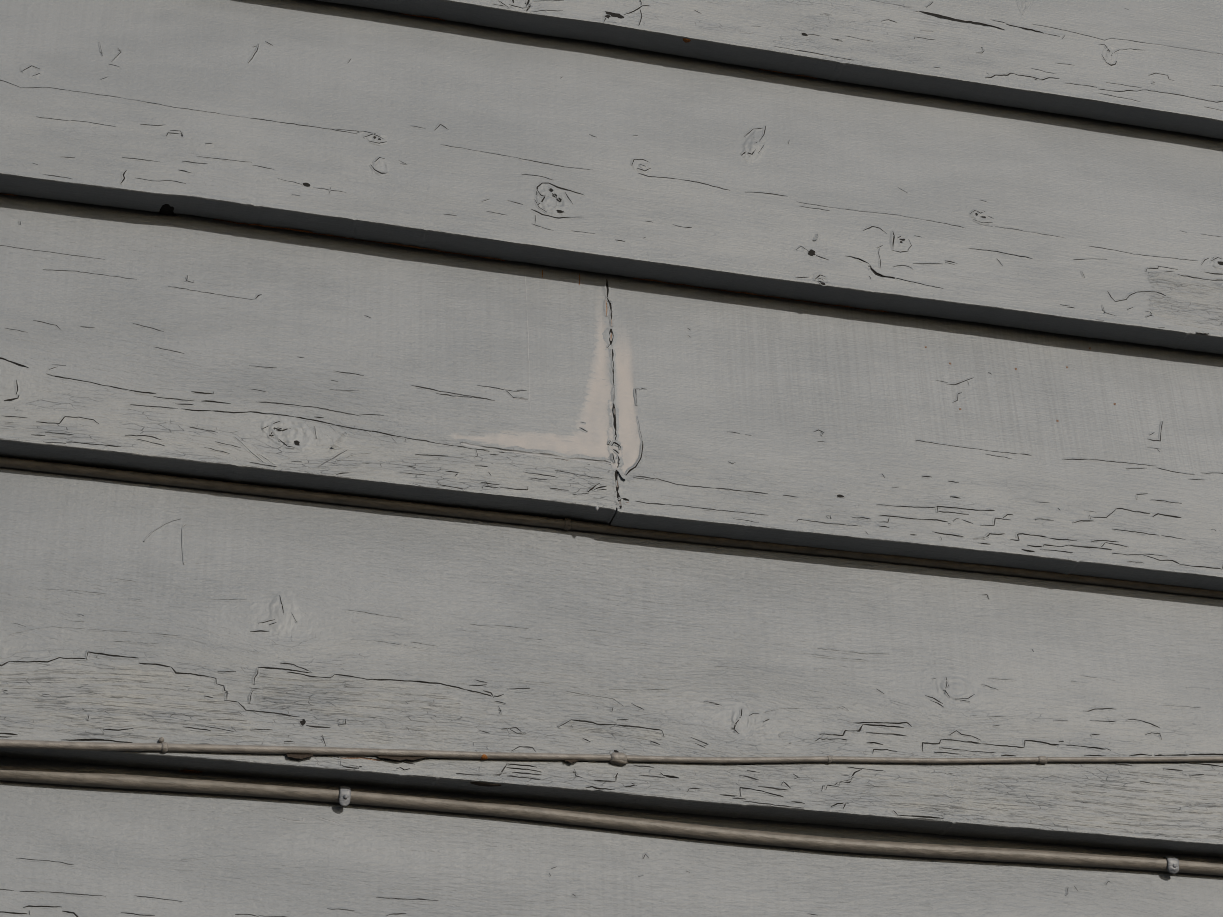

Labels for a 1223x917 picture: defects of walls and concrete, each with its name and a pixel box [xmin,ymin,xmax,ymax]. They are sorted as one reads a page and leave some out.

crack [0,244,137,280]
crack [168,285,255,301]
crack [0,319,1223,571]
crack [250,595,298,634]
crack [0,650,542,781]
crack [557,676,1223,809]
crack [892,810,944,821]
crack [0,857,183,917]
crack [235,896,439,917]